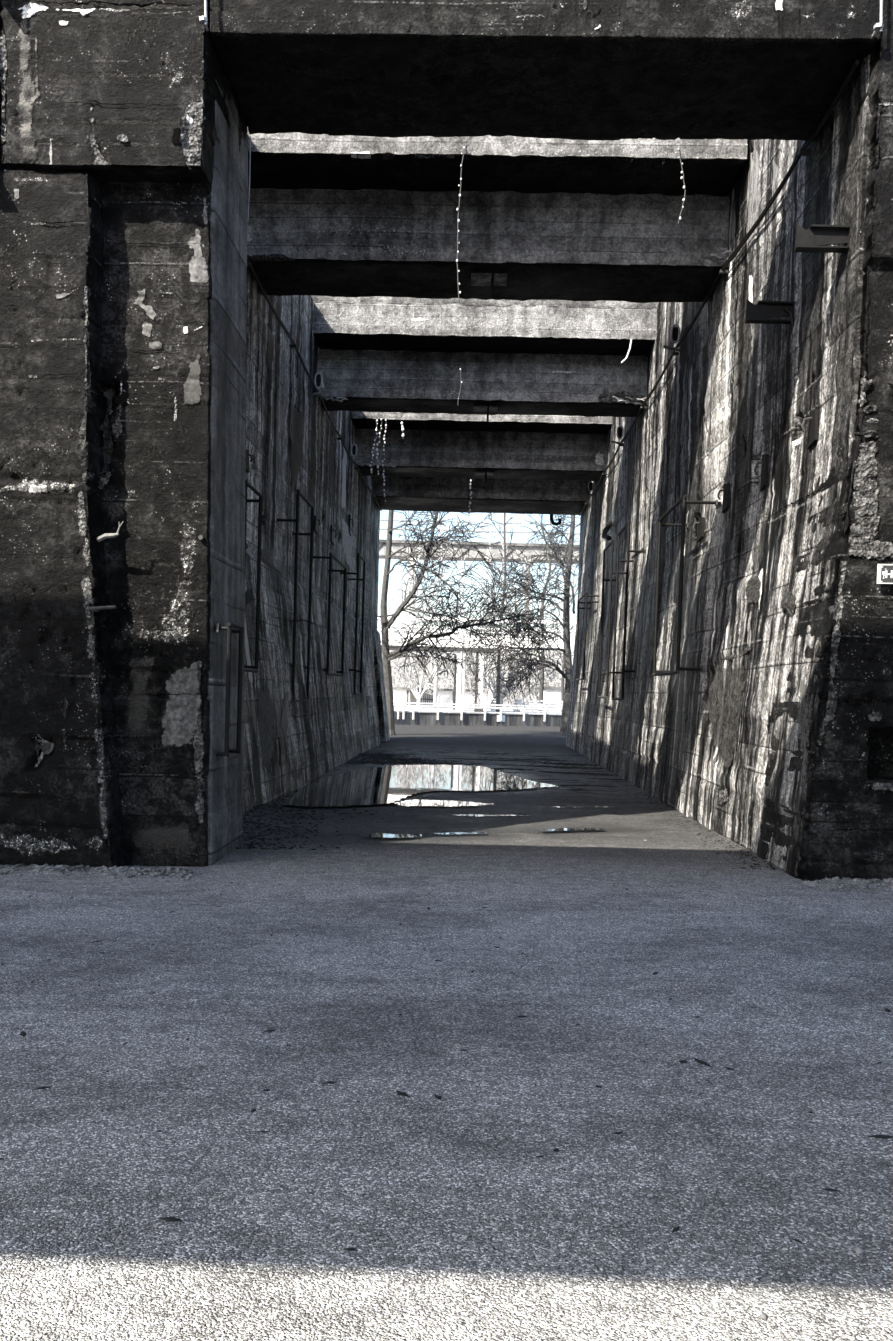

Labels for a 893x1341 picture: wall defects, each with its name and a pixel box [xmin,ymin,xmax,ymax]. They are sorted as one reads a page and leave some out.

peeling [56,8,112,16]
spalling [848,371,880,544]
spalling [817,561,847,746]
spalling [193,703,204,823]